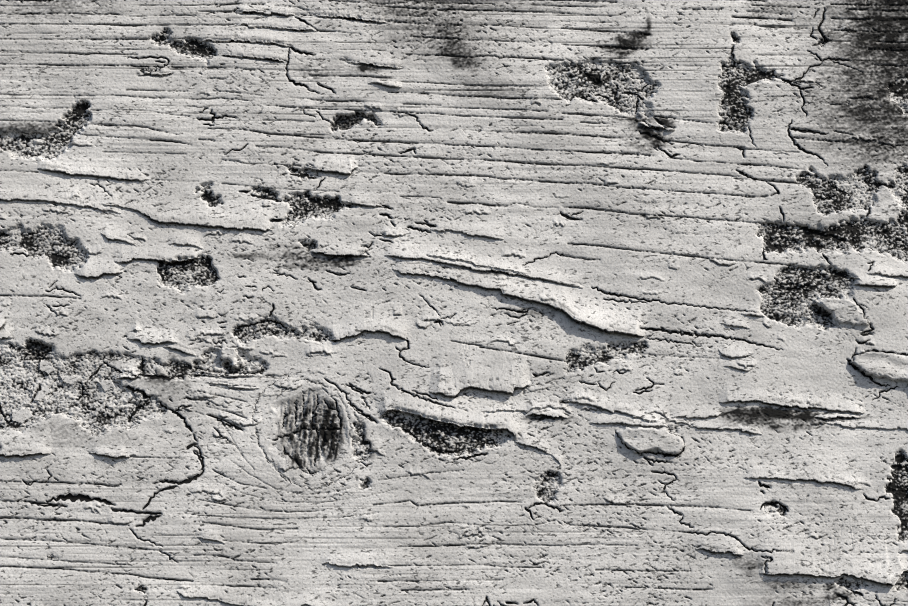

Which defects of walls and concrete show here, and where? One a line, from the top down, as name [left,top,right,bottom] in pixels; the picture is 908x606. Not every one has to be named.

spalling [718,35,779,133]
crack [779,9,863,166]
peeling [0,158,383,231]
crack [46,282,79,312]
spalling [0,225,219,293]
crack [215,271,366,348]
crack [423,298,455,326]
crack [493,308,529,325]
spalling [720,166,908,330]
spalling [0,304,409,457]
crack [23,397,243,561]
spalling [380,387,908,503]